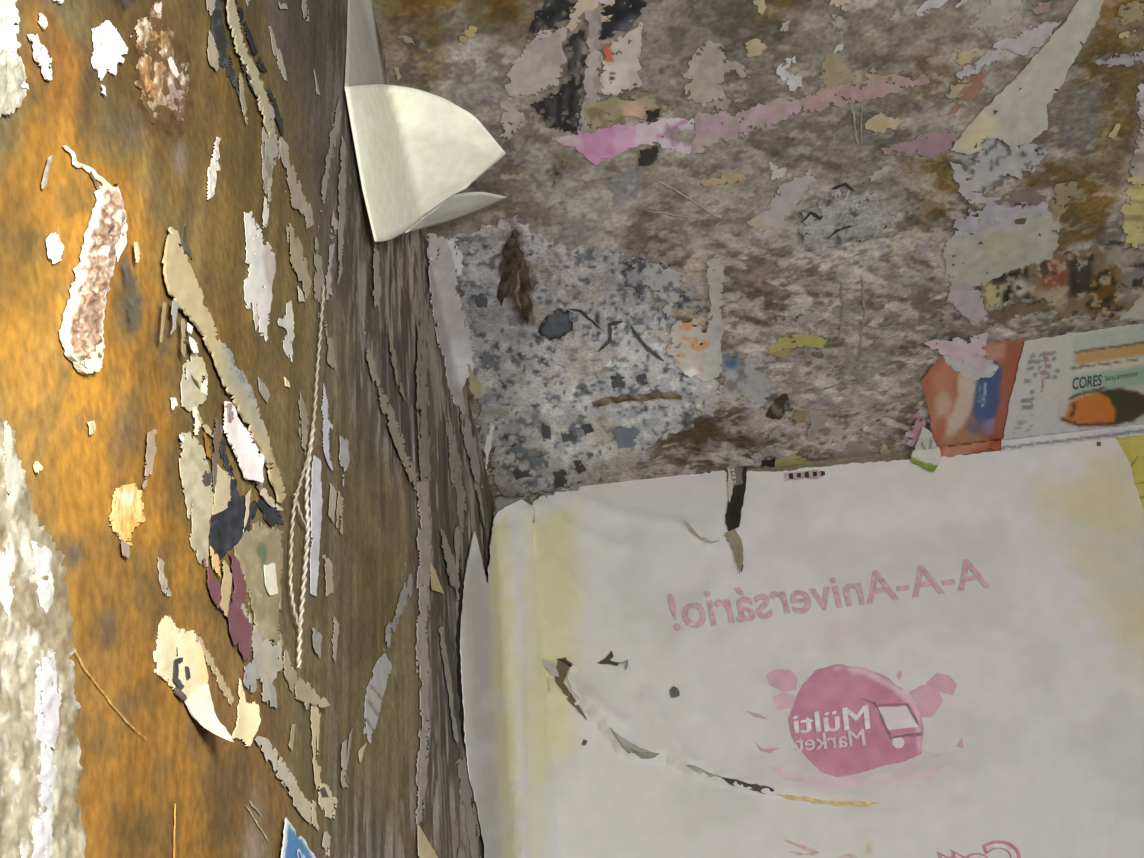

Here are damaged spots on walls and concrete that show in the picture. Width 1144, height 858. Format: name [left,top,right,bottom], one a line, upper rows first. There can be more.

peeling [0,0,53,117]
rust [138,10,190,133]
peeling [46,232,64,264]
flaking render [59,184,140,374]
peeling [187,323,199,353]
spalling [0,414,87,858]